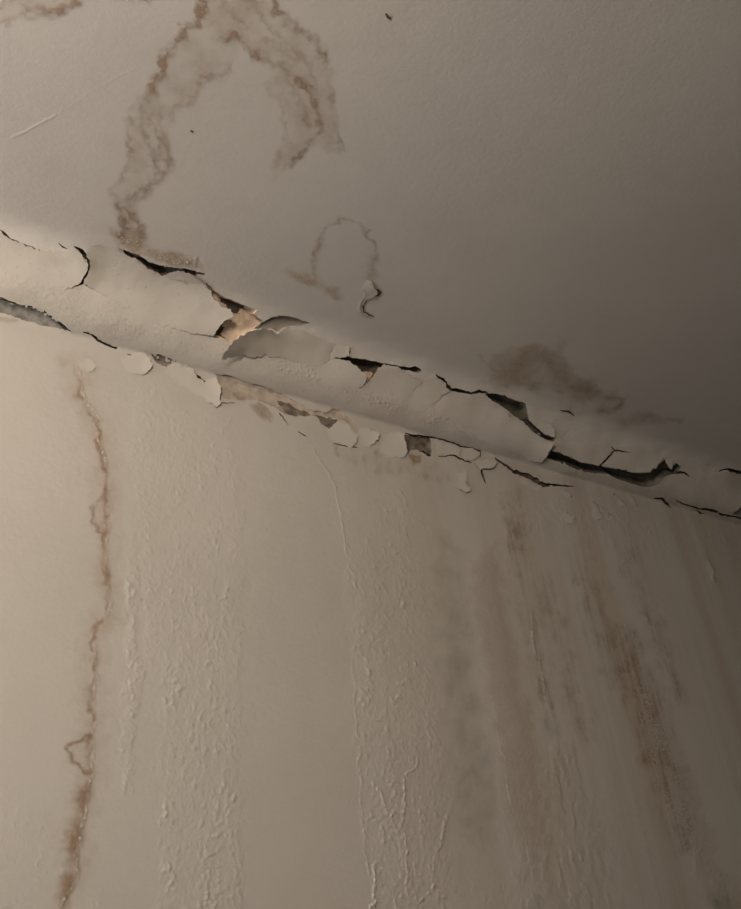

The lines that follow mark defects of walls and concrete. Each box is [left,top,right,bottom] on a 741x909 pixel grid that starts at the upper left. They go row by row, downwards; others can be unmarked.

leakage [194,0,207,27]
leakage [148,53,168,92]
crack [59,243,90,287]
crack [123,250,205,276]
crack [61,324,130,355]
peeling [0,230,741,513]
crack [335,357,555,441]
crack [405,433,574,497]
crack [719,467,741,475]
crack [654,497,741,519]